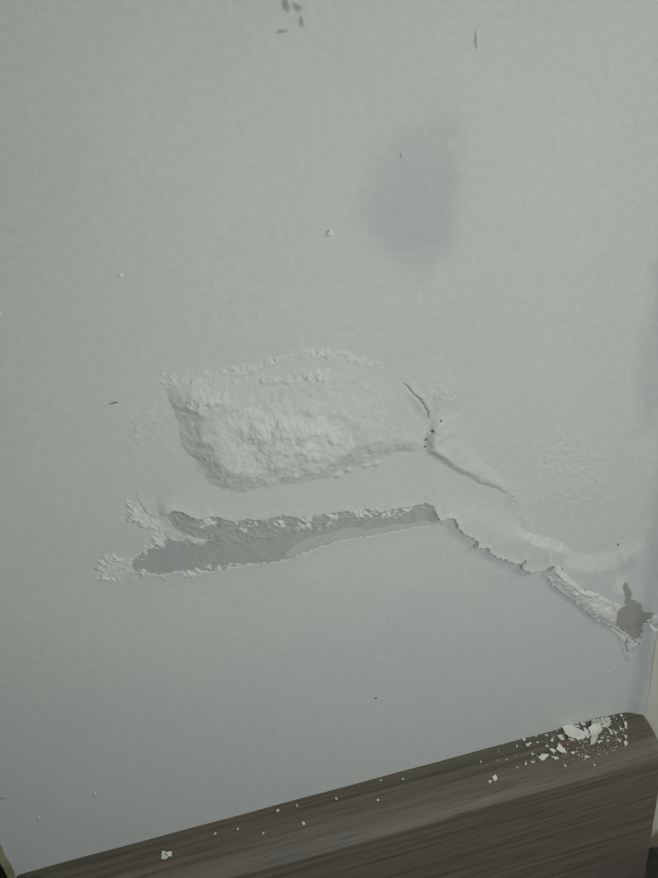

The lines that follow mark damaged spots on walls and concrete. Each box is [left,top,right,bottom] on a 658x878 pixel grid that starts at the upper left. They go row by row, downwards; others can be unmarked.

peeling [93,463,658,647]